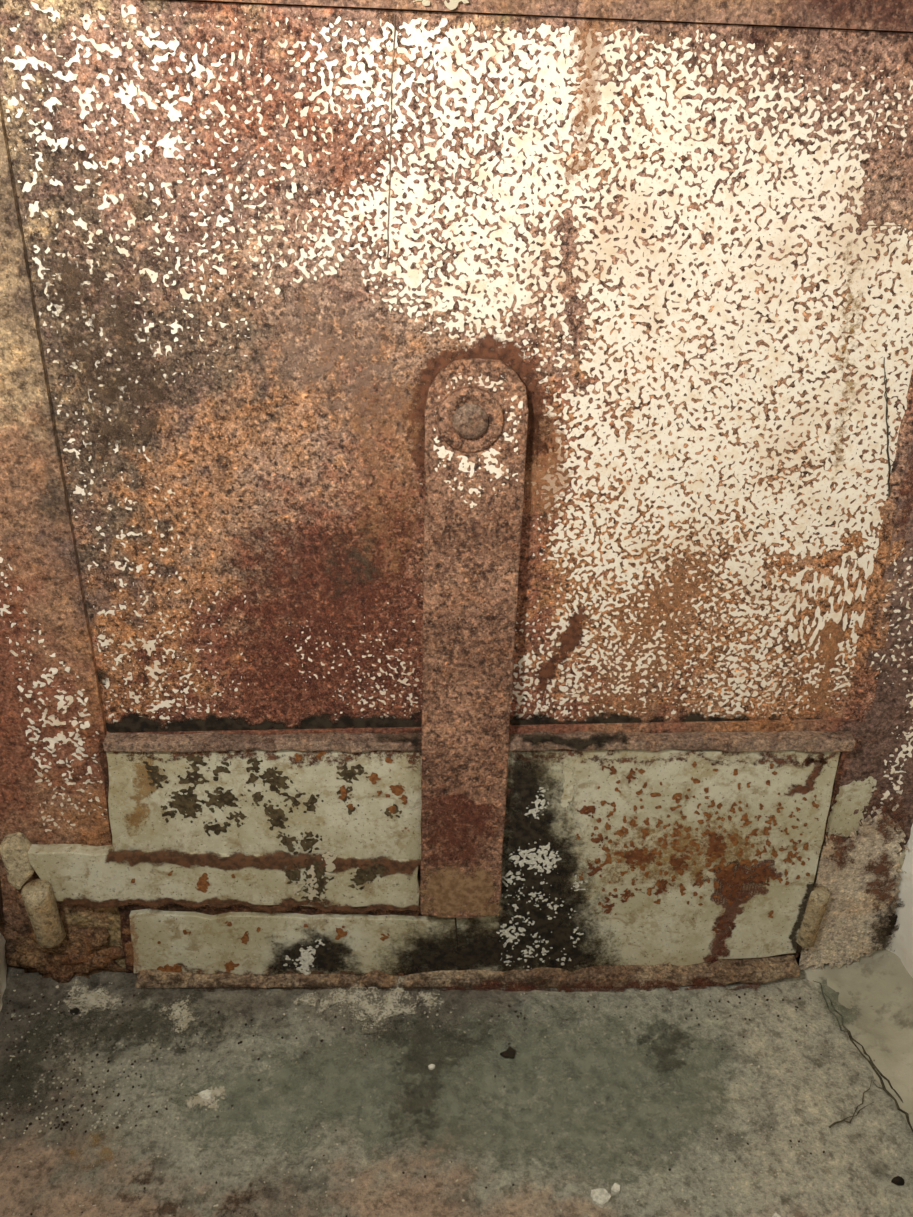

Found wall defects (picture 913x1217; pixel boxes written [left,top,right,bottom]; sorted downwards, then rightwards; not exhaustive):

peeling [0,0,913,936]
corrosion [403,334,553,482]
corrosion [835,243,859,467]
corrosion [60,497,510,940]
leakage [60,978,225,1058]
corrosion [156,960,367,976]
leakage [175,976,733,1184]
corrosion [442,749,905,992]
leakage [820,980,859,1024]
crack [814,981,913,1132]